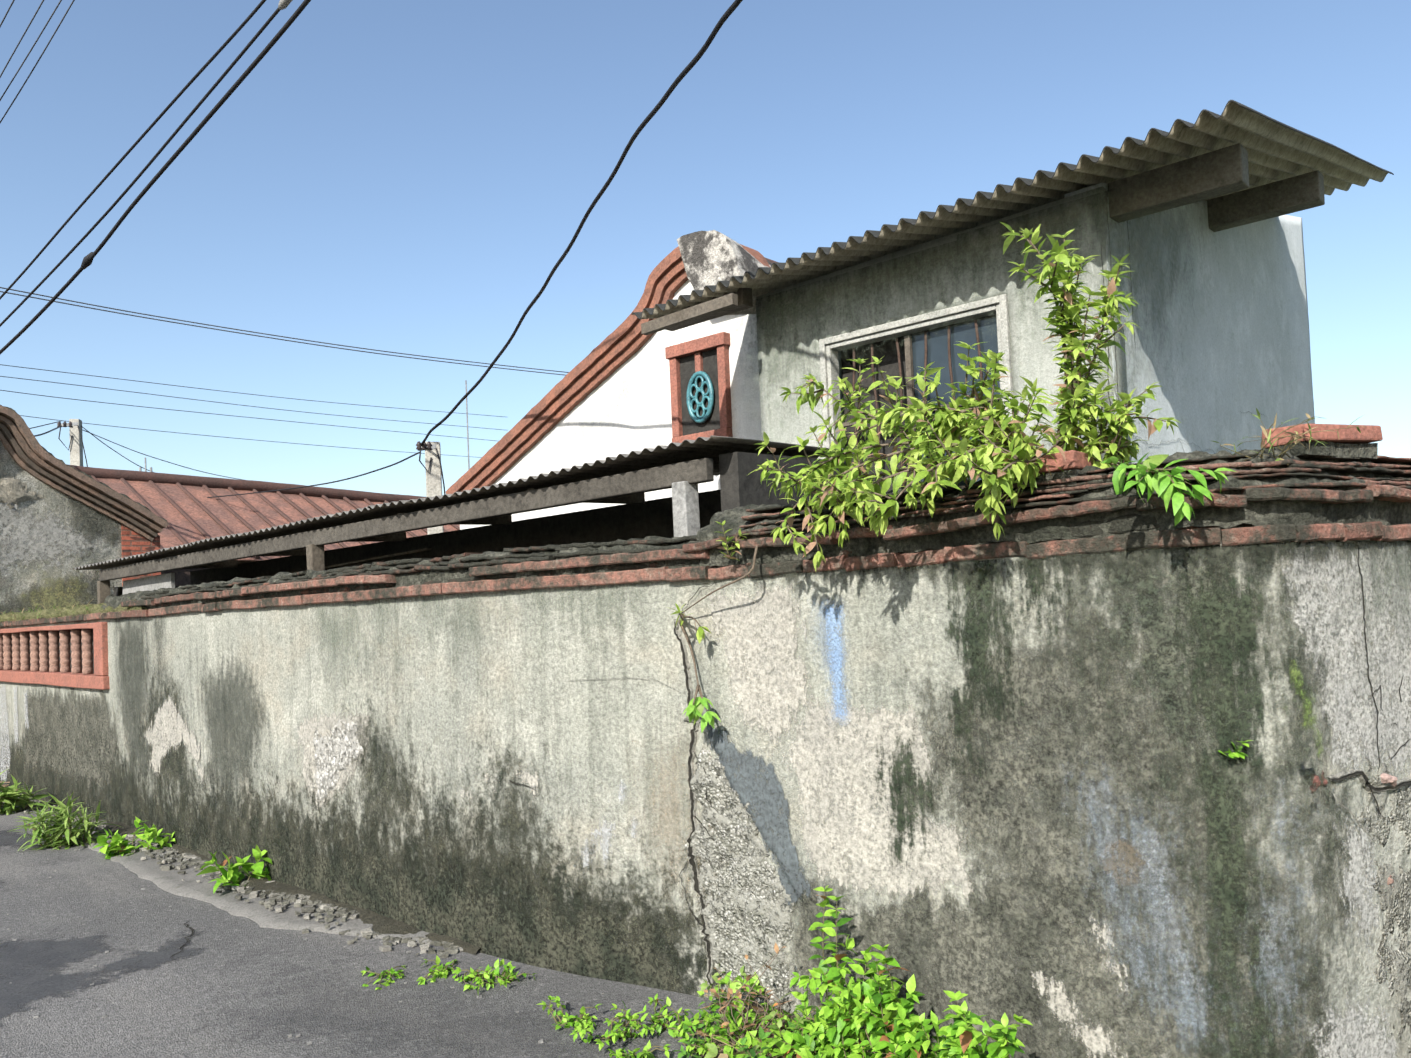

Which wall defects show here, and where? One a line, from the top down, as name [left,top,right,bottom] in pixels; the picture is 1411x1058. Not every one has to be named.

leakage [0,569,114,615]
leakage [68,497,125,545]
leakage [0,616,718,997]
crack [570,582,717,989]
peeling [676,584,973,1014]
leakage [784,540,1411,1058]
peeling [1278,540,1411,1058]
crack [1327,547,1411,843]